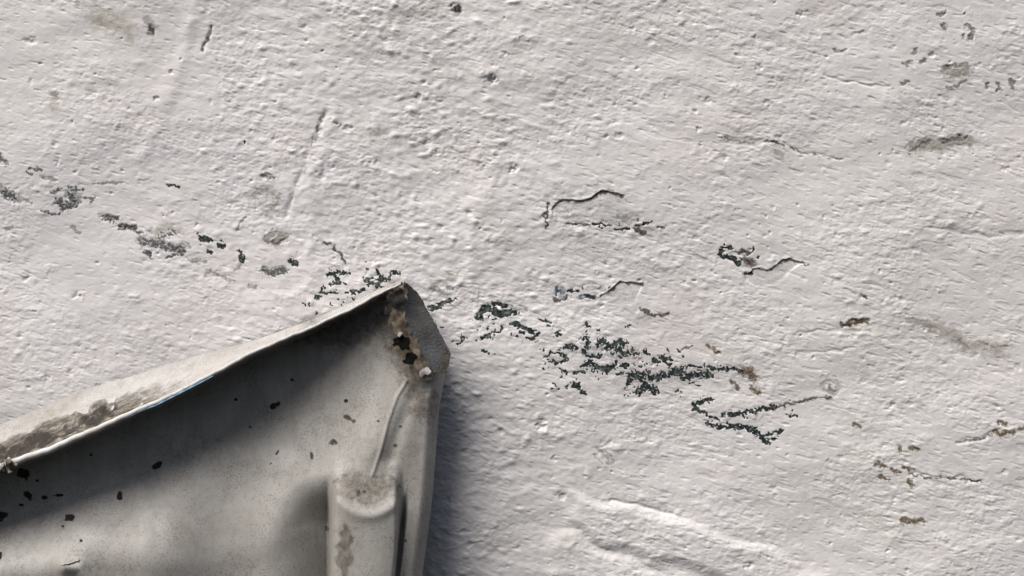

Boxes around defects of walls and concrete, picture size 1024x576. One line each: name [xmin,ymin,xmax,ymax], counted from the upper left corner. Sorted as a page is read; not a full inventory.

flaking render [942,63,969,89]
peeling [40,186,96,216]
peeling [102,214,186,259]
peeling [196,232,245,263]
flaking render [264,230,289,247]
peeling [261,258,299,279]
peeling [302,241,401,315]
peeling [553,278,644,303]
peeling [452,301,824,446]